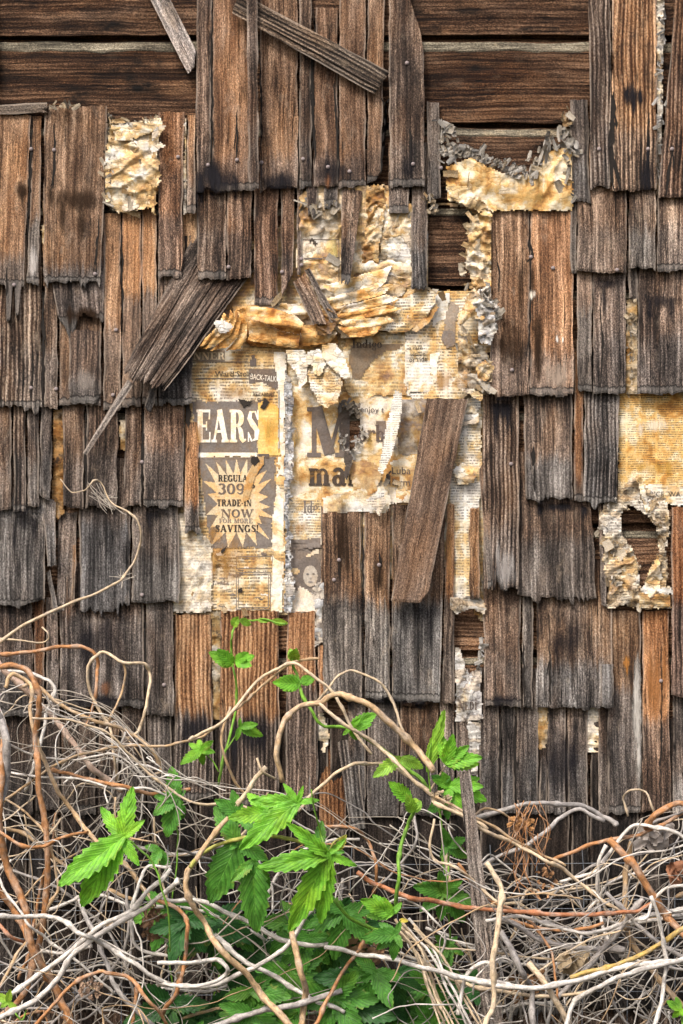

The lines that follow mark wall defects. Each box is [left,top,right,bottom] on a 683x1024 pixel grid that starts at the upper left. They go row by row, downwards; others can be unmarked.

leakage [196,162,238,203]
leakage [261,163,292,190]